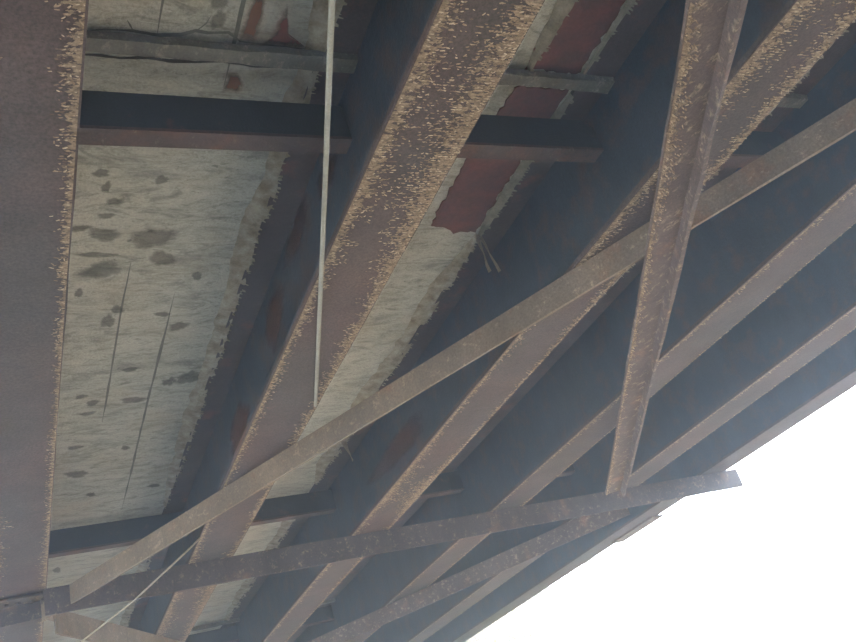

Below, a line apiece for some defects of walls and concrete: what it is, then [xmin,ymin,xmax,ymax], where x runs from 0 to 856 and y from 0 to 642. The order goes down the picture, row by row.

rust [242,0,264,40]
rust [266,10,303,46]
leakage [93,170,122,218]
rust [318,157,335,197]
leakage [72,226,115,240]
leakage [82,253,117,277]
leakage [135,231,174,264]
leakage [164,371,199,385]
rust [231,405,249,456]